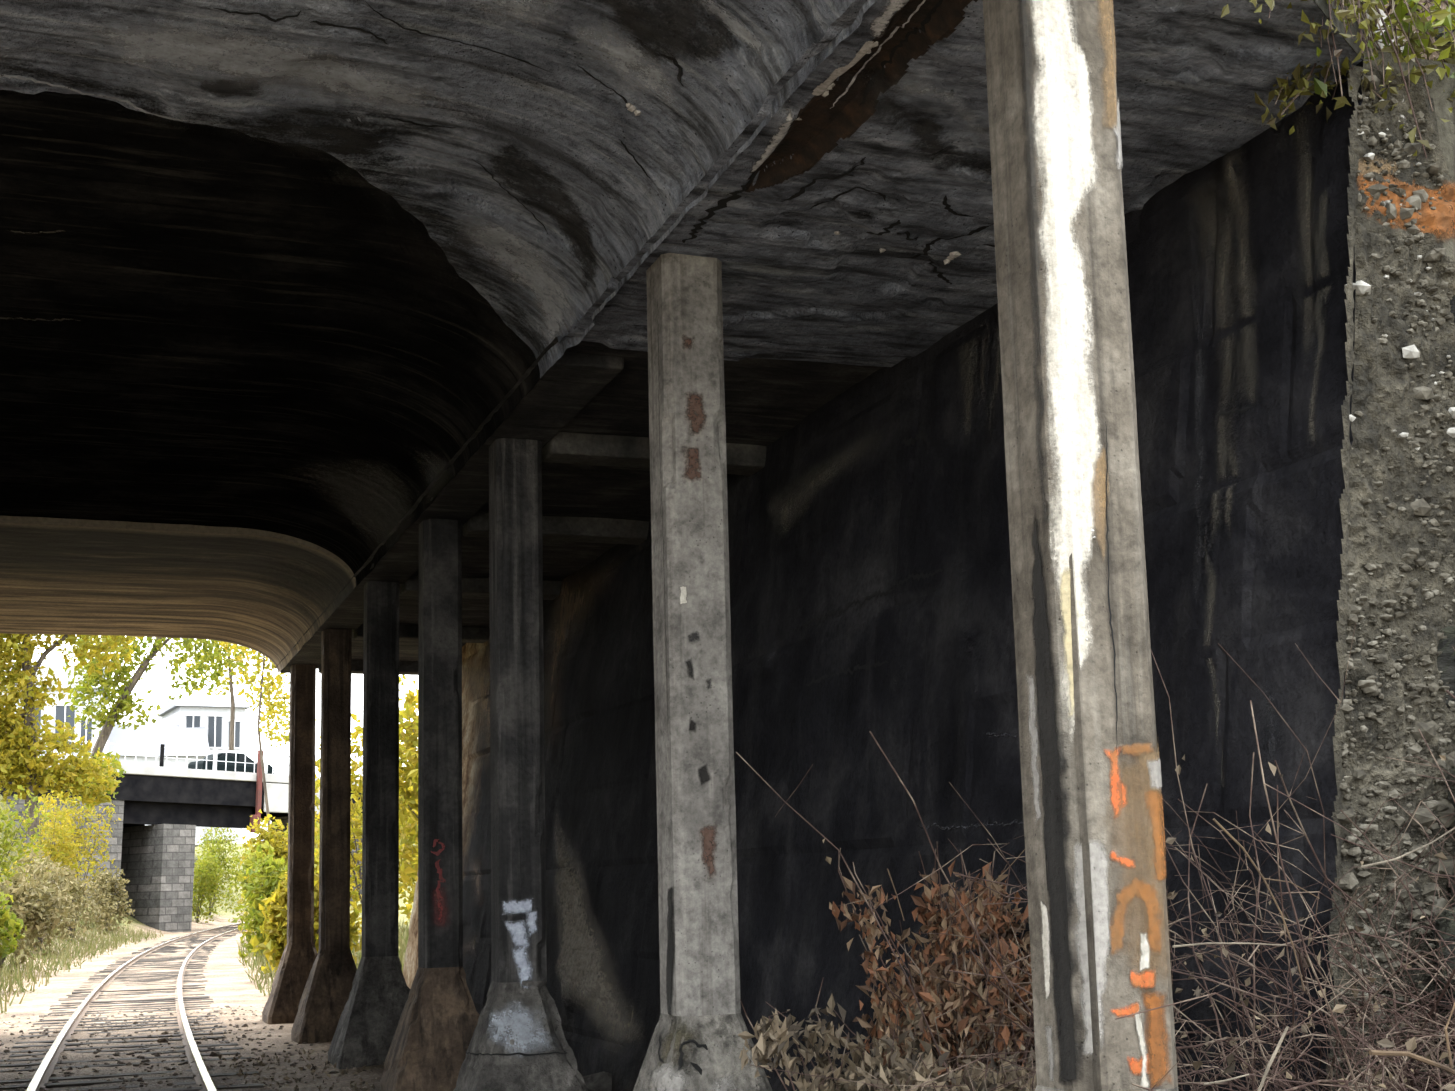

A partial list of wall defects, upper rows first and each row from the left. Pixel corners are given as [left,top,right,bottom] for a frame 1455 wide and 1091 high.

spalling [745,0,978,192]
leakage [1113,100,1123,168]
crack [682,172,755,243]
crack [781,157,995,284]
leakage [1278,117,1330,437]
corrosion [1358,161,1455,238]
leakage [1031,0,1100,740]
corrosion [682,393,707,481]
leakage [1185,155,1255,775]